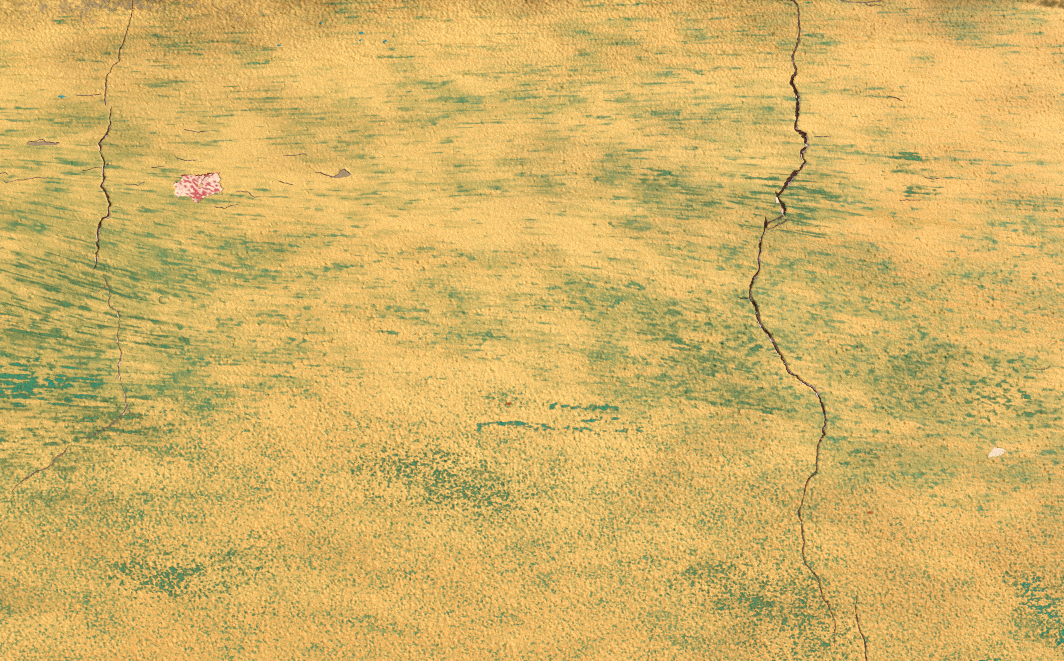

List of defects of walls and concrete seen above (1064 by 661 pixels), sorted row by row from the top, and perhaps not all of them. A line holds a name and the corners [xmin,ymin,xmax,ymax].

crack [838,0,883,8]
peeling [173,172,260,209]
crack [12,1,138,491]
crack [738,0,867,661]
peeling [989,447,1006,457]